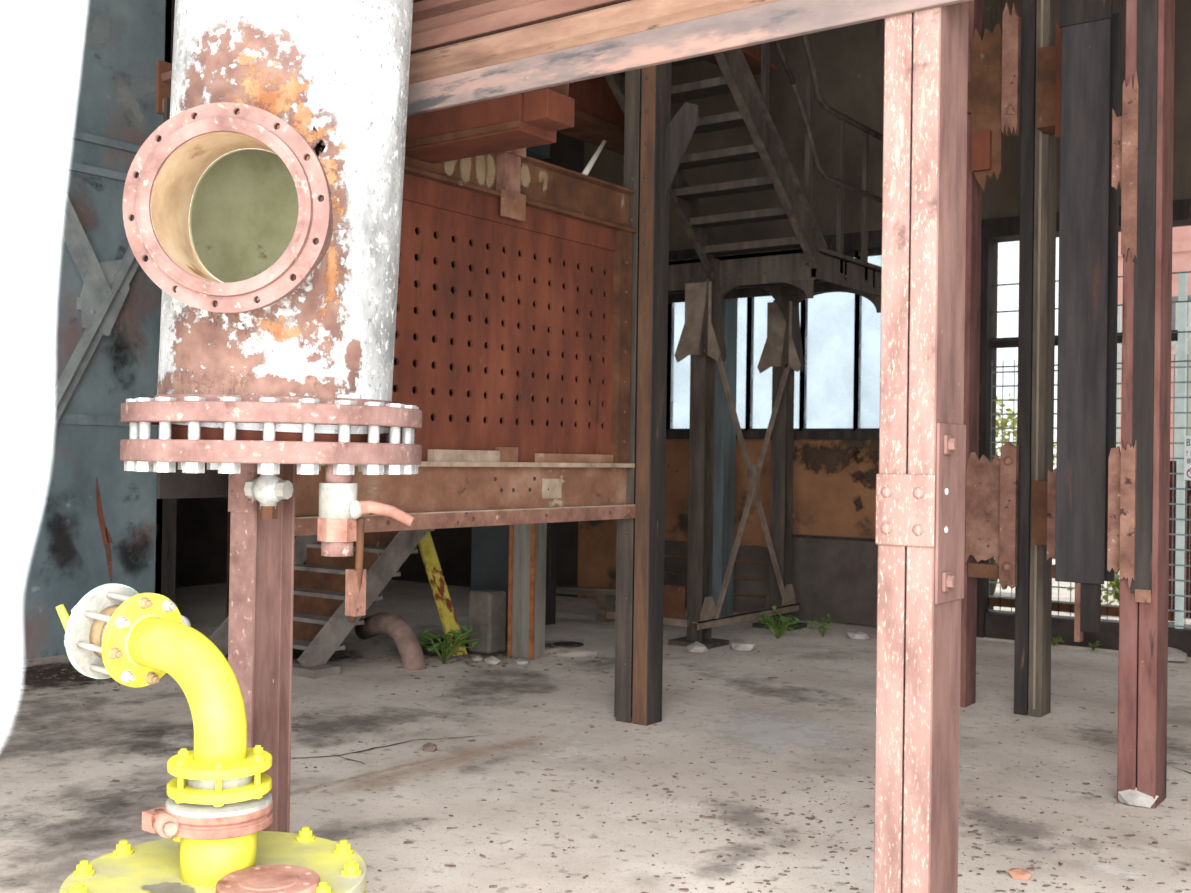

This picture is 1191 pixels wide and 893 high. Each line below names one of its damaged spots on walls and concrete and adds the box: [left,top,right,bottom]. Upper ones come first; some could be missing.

corrosion [157,22,362,398]